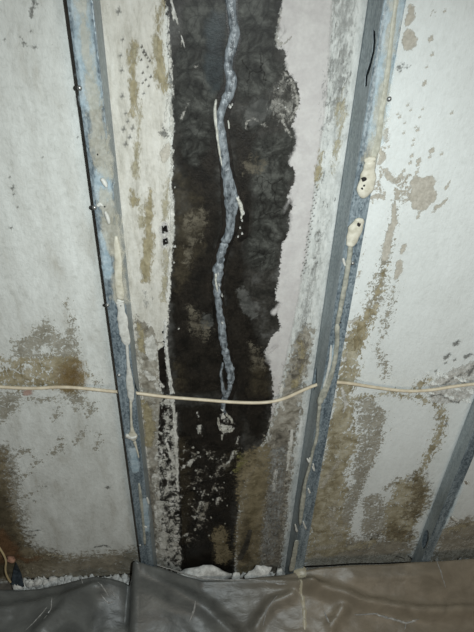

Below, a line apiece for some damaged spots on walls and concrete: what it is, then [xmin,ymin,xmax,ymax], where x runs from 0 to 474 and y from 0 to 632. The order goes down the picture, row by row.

water stain [401,4,418,51]
mould [322,53,352,160]
water stain [0,298,103,425]
water stain [120,0,316,575]
water stain [305,120,449,570]
water stain [0,437,141,583]
water stain [430,517,474,562]